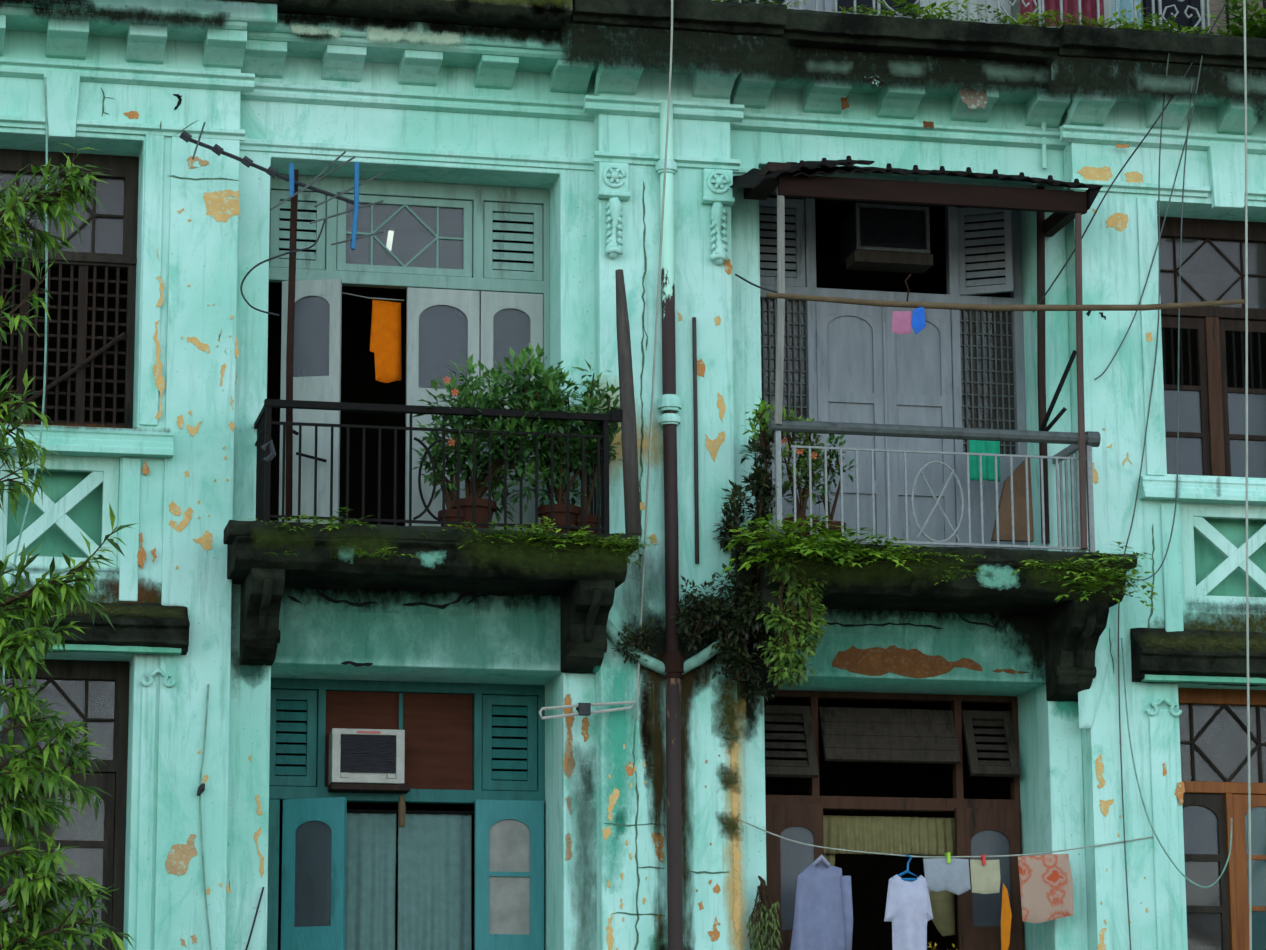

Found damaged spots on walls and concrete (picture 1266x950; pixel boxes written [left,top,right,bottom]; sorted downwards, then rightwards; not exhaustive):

water stain [0,0,1266,122]
spalling [958,87,988,109]
peeling [1076,166,1143,183]
peeling [203,189,240,222]
peeling [1093,209,1129,231]
peeling [153,276,165,419]
peeling [177,411,202,437]
water stain [90,578,119,591]
flaking render [832,645,1030,679]
water stain [628,614,722,950]
peeling [165,834,197,876]
water stain [576,759,594,937]